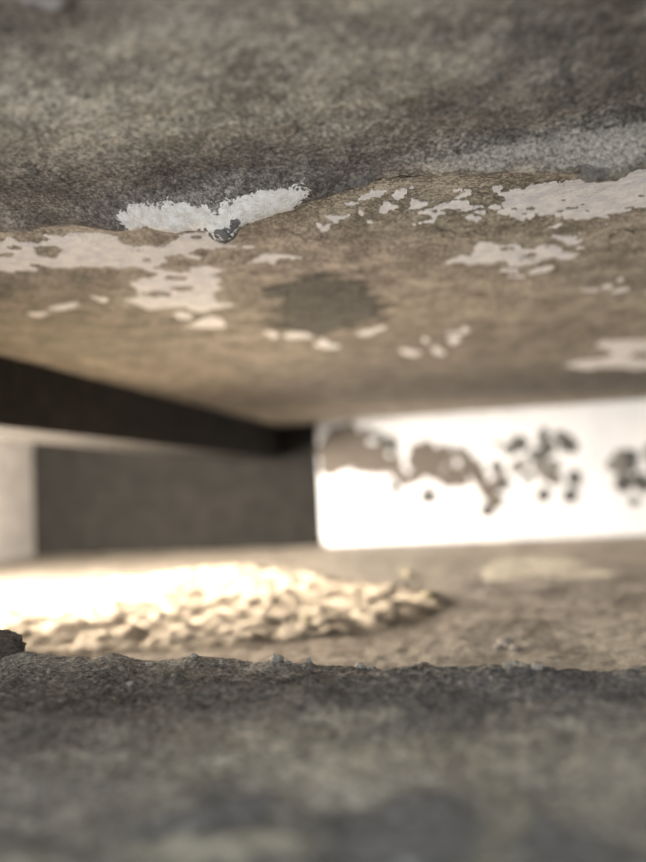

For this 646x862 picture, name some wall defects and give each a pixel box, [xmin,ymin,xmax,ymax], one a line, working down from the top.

peeling [0,178,312,328]
leakage [255,273,398,336]
peeling [316,122,646,278]
peeling [564,340,646,370]